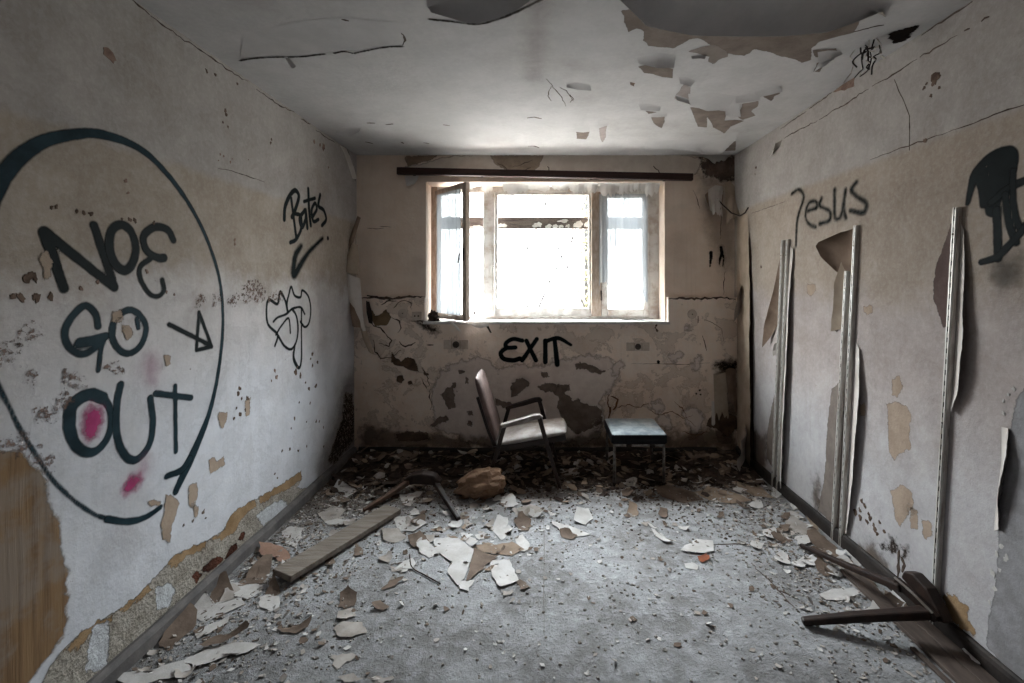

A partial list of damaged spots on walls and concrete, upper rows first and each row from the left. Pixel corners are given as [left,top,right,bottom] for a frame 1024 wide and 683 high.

crack [133,0,335,143]
peeling [620,0,886,164]
peeling [371,300,625,446]
flaking render [651,398,737,436]
peeling [886,376,911,461]
peeling [0,431,435,683]
peeling [639,477,866,612]
peeling [853,498,886,536]
peeling [890,484,933,540]
peeling [943,391,1024,680]
peeling [831,623,922,679]